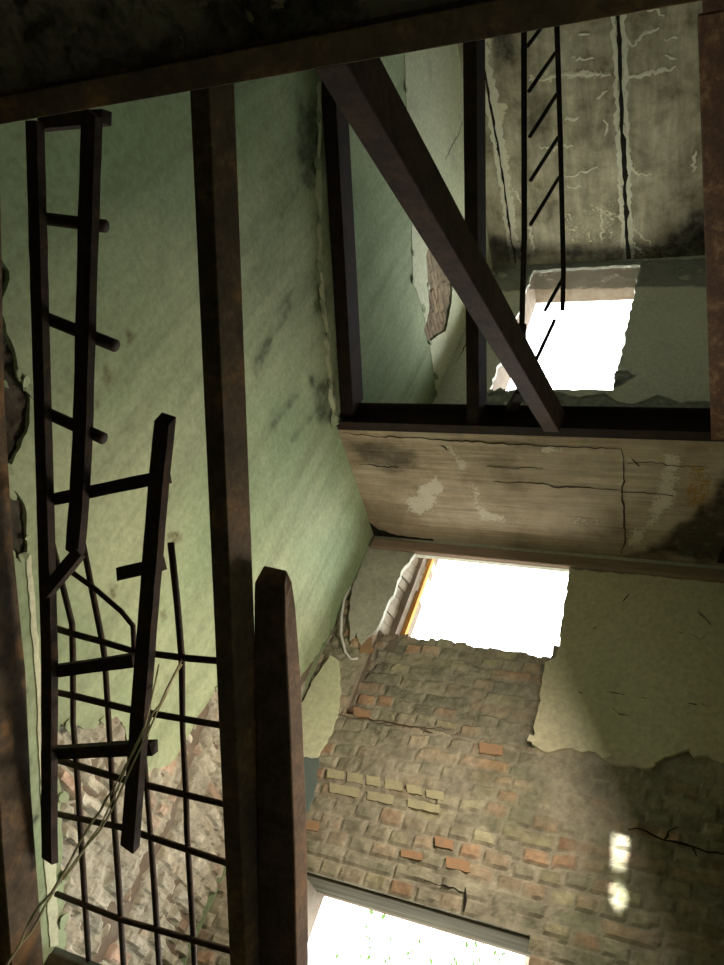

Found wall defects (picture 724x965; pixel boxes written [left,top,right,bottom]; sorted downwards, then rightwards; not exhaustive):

peeling [404,44,465,220]
crack [528,8,678,259]
leakage [565,160,634,244]
peeling [412,223,466,398]
leakage [493,254,706,291]
spalling [3,334,33,475]
leakage [404,476,444,516]
crack [349,433,709,554]
leakage [620,454,724,562]
flaking render [58,687,225,965]
crack [424,880,467,912]
crack [628,826,724,856]